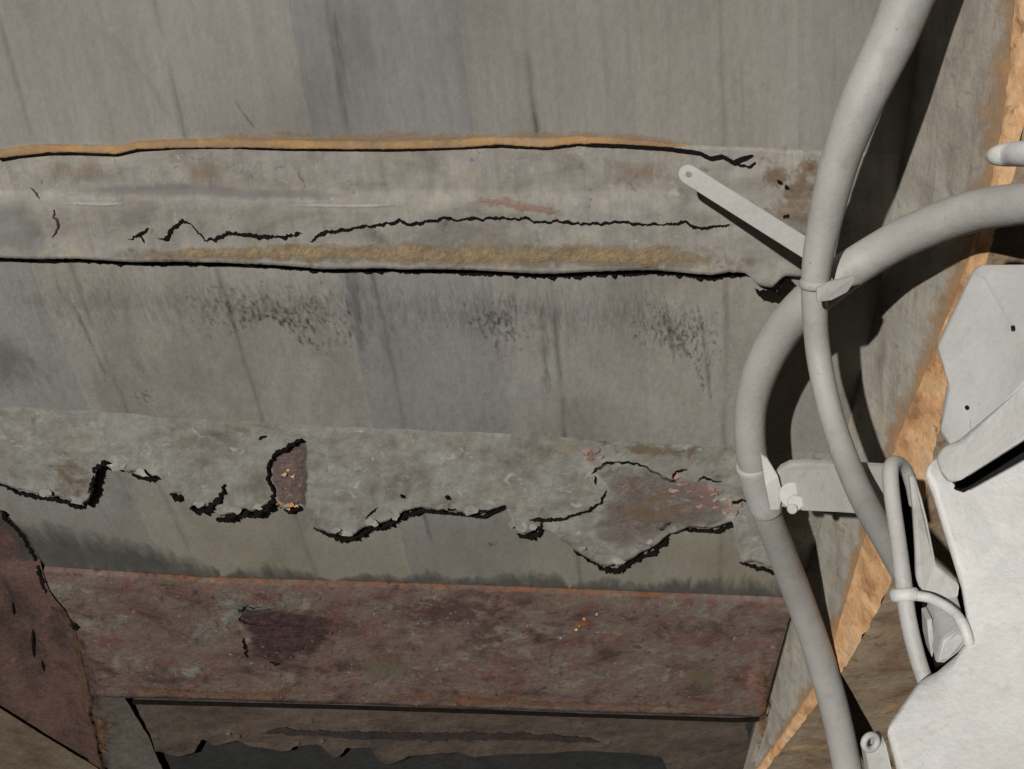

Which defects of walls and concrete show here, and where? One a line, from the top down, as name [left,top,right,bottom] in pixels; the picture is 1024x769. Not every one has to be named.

crack [1,148,171,160]
crack [241,143,755,168]
crack [0,216,796,300]
spalling [272,442,306,511]
corrosion [474,585,614,605]